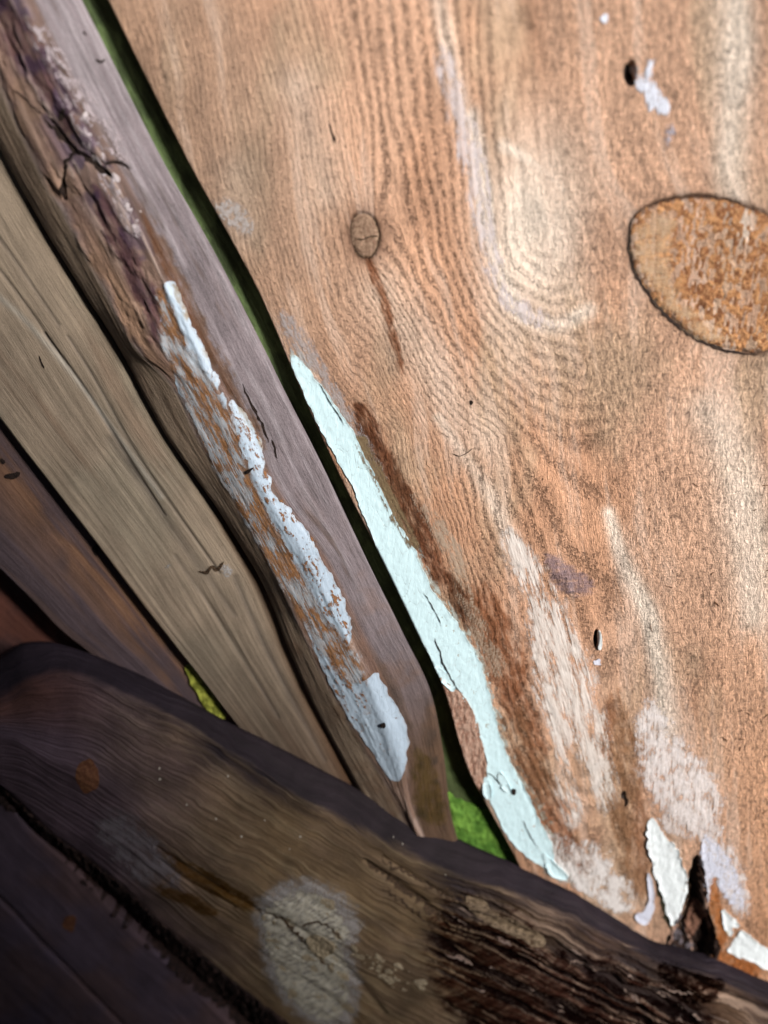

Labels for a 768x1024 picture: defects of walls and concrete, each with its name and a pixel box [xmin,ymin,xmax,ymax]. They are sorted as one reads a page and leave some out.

crack [15,90,129,200]
peeling [156,281,410,781]
peeling [290,351,576,884]
peeling [635,817,688,926]
peeling [698,834,768,970]